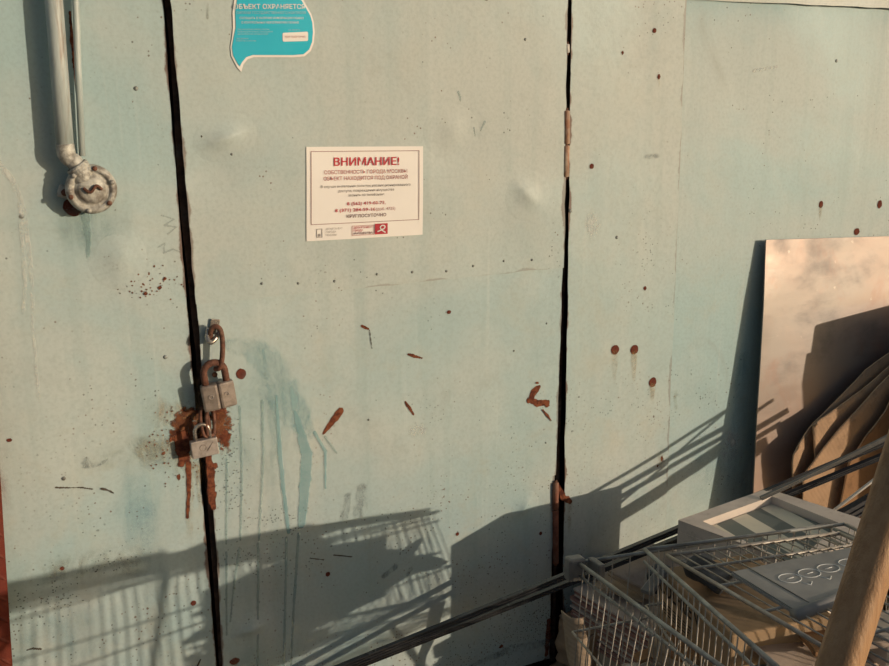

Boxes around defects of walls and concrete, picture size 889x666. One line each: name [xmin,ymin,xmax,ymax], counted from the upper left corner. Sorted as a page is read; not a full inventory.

rust [527,382,552,421]
rust [141,407,242,519]